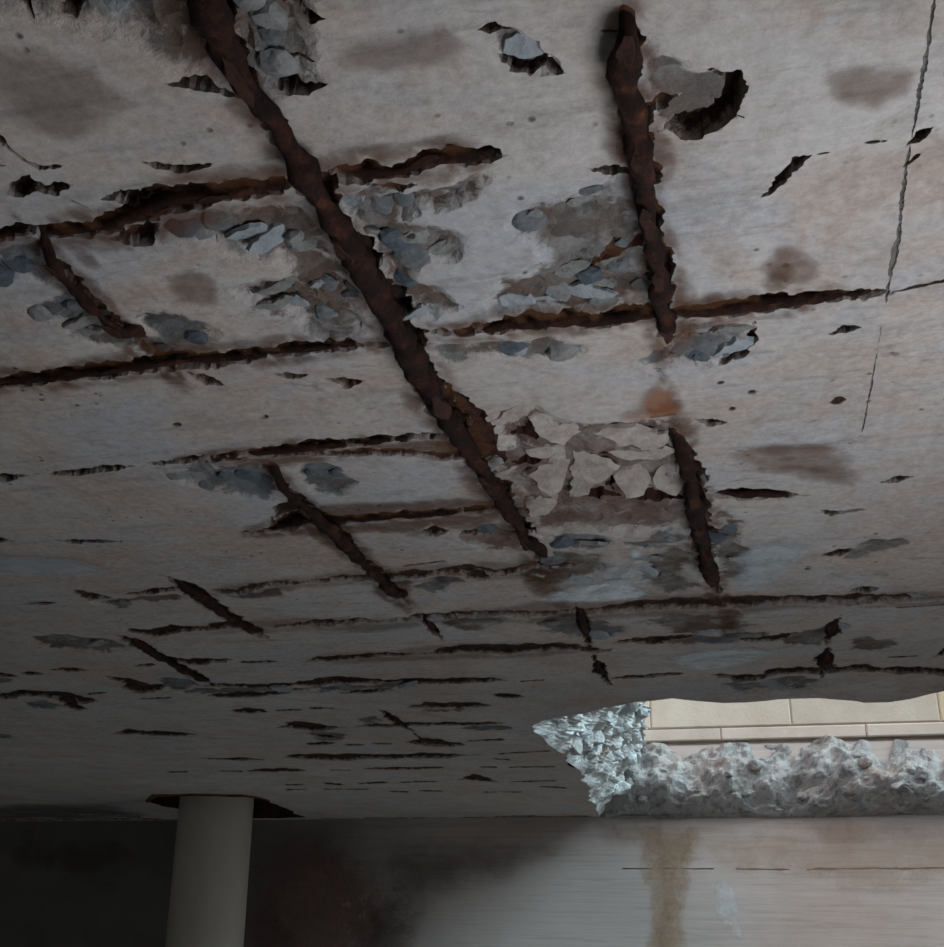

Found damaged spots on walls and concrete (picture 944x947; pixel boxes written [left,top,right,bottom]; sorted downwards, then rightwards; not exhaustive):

crack [760,152,830,199]
crack [865,0,936,303]
crack [591,233,643,265]
spalling [0,0,944,641]
crack [298,438,480,462]
crack [510,417,541,465]
crack [587,451,683,502]
crack [127,560,944,637]
crack [710,648,944,683]
crack [0,635,694,819]
spalling [532,701,944,819]
spalling [145,793,304,818]